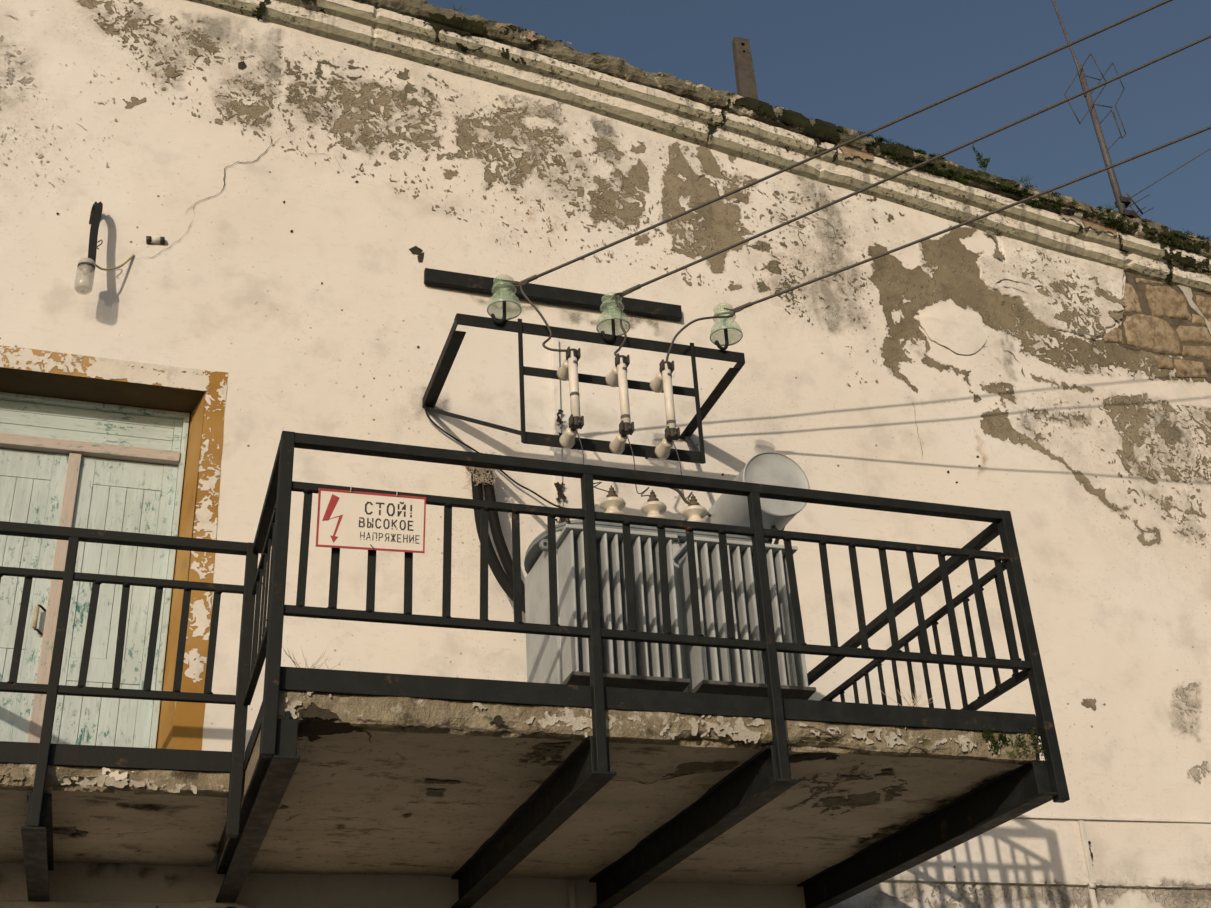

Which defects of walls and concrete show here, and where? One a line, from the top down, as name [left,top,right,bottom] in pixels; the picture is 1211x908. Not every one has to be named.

peeling [0,35,47,111]
crack [132,135,285,260]
peeling [59,0,1211,548]
peeling [0,346,228,683]
spalling [283,691,365,742]
spalling [472,702,505,726]
peeling [519,707,764,766]
peeling [798,722,1021,755]
peeling [58,767,226,794]
spalling [786,752,909,815]
peeling [1187,761,1210,784]
peeling [902,880,1211,908]